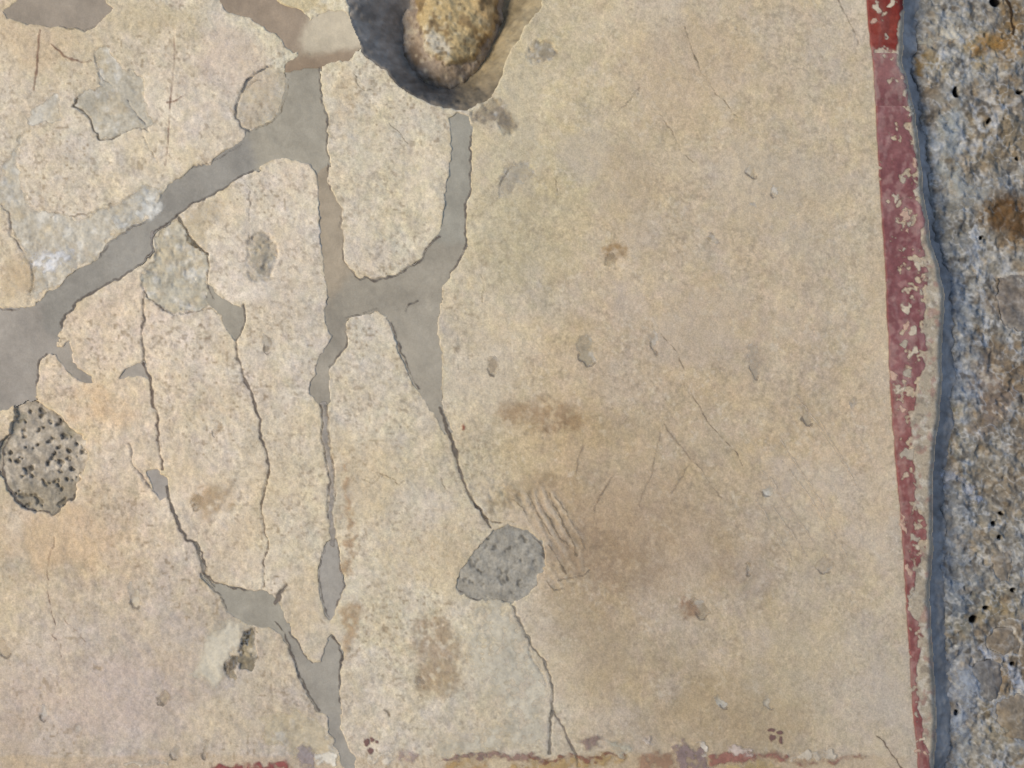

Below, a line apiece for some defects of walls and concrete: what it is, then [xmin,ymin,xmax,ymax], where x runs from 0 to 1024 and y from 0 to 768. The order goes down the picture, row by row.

peeling [73,46,153,140]
spalling [347,0,542,129]
peeling [871,0,895,23]
peeling [0,136,158,298]
flaking render [141,217,209,313]
crack [0,68,498,547]
flaking render [0,400,88,516]
crack [131,300,356,768]
peeling [890,304,930,768]
flaking render [224,629,257,680]
peeling [262,710,337,760]
crack [512,606,578,762]